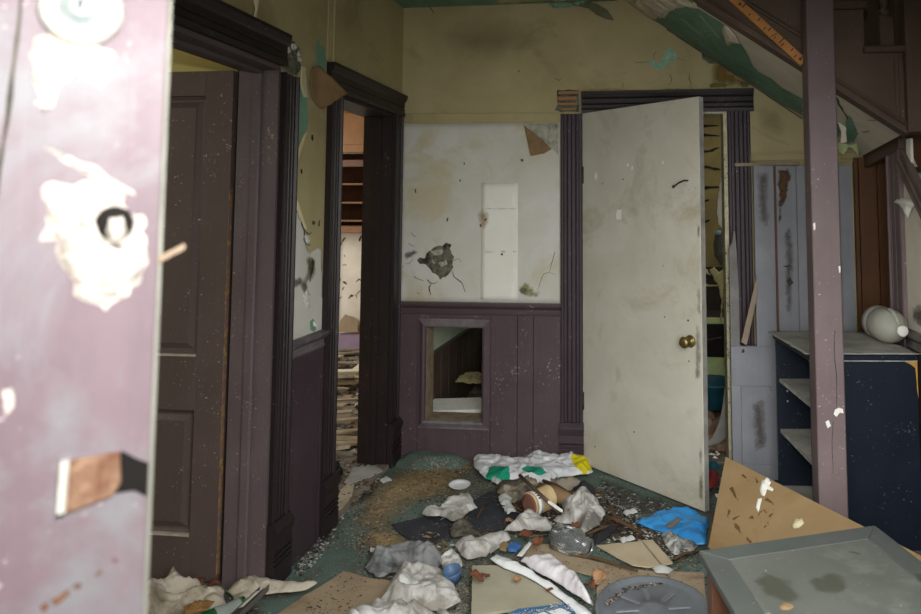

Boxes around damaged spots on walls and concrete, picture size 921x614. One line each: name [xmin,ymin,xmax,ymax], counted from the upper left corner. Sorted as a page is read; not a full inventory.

peeling [632,0,803,119]
flaking render [521,123,559,161]
peeling [836,97,868,157]
flaking render [293,212,323,340]
spalling [414,241,466,295]
peeling [2,388,14,415]